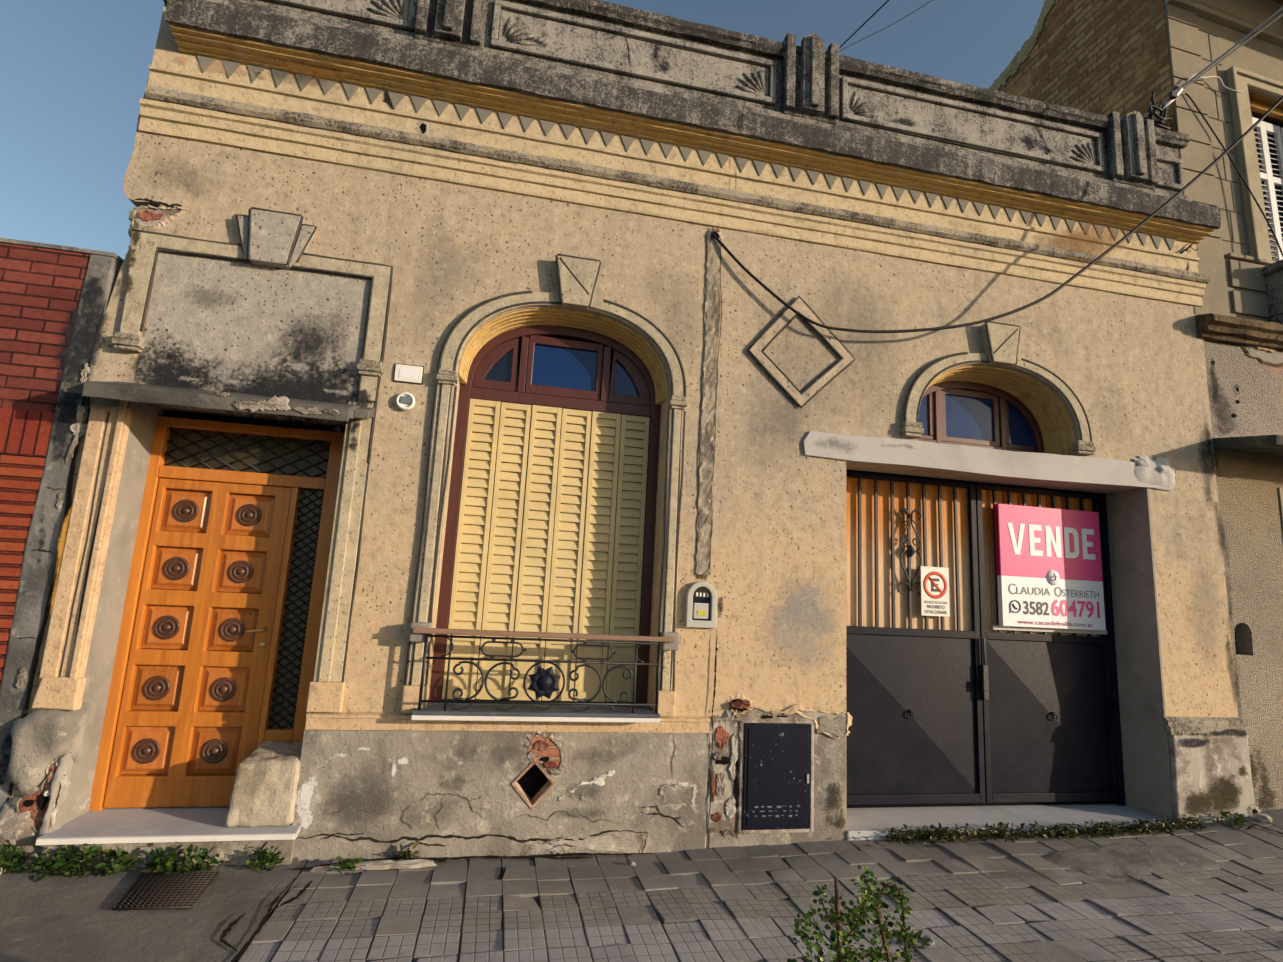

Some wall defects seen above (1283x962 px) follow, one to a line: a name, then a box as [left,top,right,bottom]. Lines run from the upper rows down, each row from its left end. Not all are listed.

damp [652,47,670,72]
damp [1022,135,1052,152]
spalling [128,205,188,237]
damp [133,326,370,450]
spalling [10,756,91,835]
crack [296,628,718,847]
spalling [521,731,566,776]
peeling [558,770,616,801]
spalling [658,694,853,839]
damp [1177,729,1246,748]